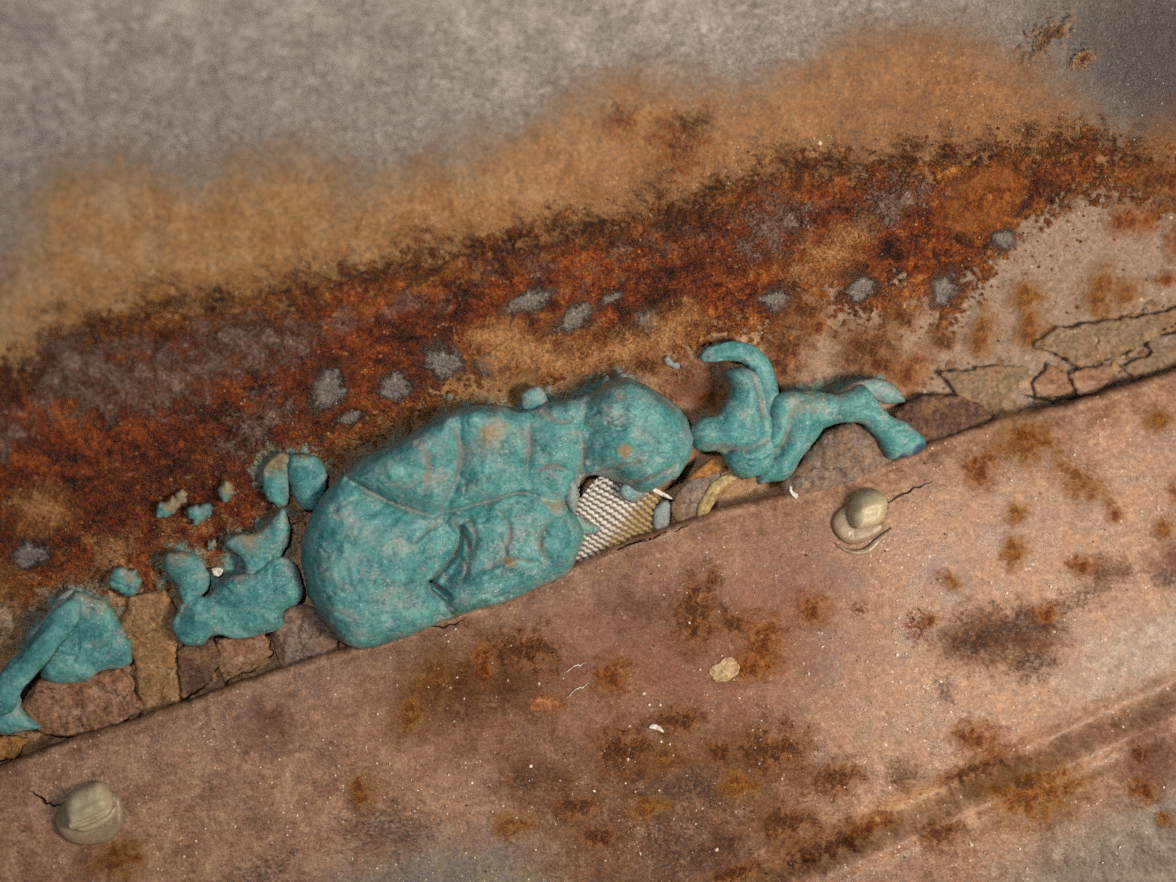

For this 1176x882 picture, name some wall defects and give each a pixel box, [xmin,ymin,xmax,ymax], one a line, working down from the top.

water stain [0,26,1176,409]
spalling [924,266,962,310]
water stain [314,322,661,474]
rust [0,101,1176,647]
peeling [939,307,1176,415]
crack [1028,323,1176,402]
peeling [119,590,273,720]
rust [902,553,1133,687]
peeling [0,735,30,760]
rust [376,560,903,882]
rust [888,719,1093,832]
rust [1126,717,1176,828]